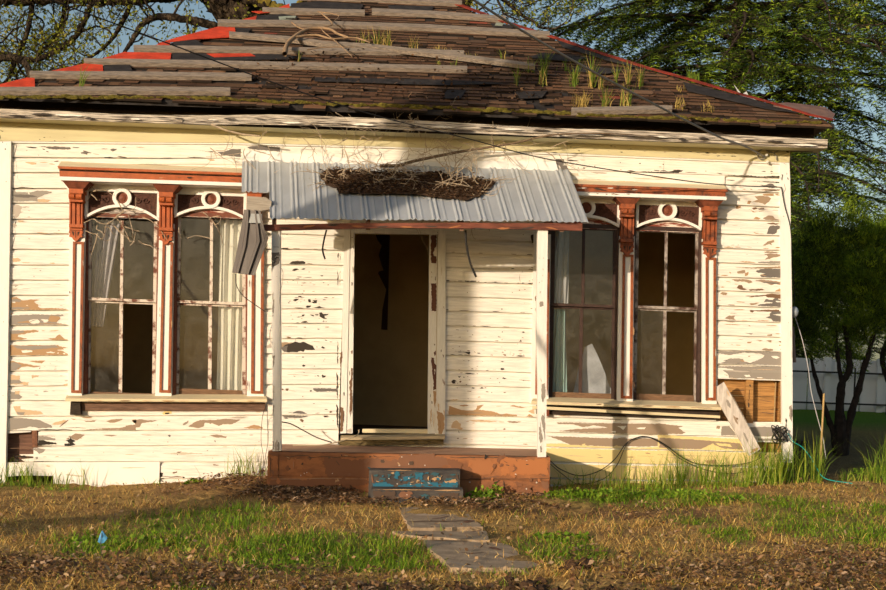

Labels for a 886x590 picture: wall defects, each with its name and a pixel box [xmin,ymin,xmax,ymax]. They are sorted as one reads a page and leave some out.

peeling [9,113,95,127]
peeling [26,137,127,165]
peeling [189,146,280,161]
peeling [730,140,817,225]
peeling [261,248,341,366]
peeling [431,232,449,311]
peeling [715,232,792,387]
peeling [3,284,170,440]
peeling [188,416,263,442]
peeling [273,385,307,437]
peeling [288,350,353,433]
peeling [430,344,793,472]